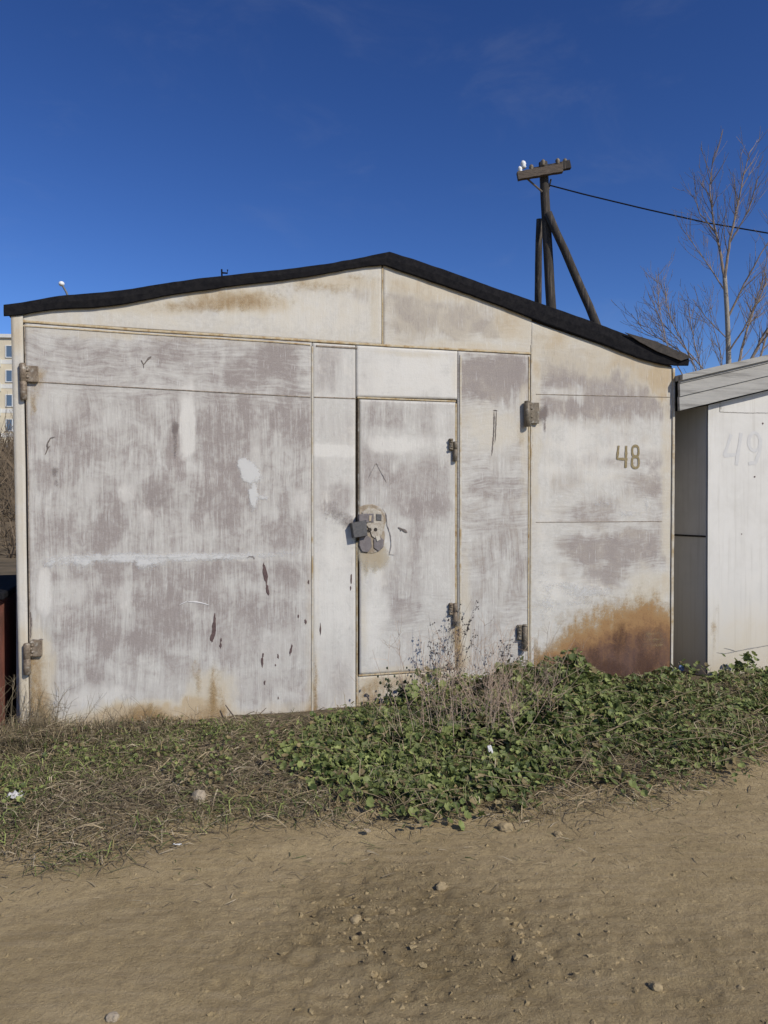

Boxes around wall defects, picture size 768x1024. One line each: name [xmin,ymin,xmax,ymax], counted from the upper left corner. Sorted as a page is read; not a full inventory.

peeling [237,458,267,508]
rust [534,599,671,677]